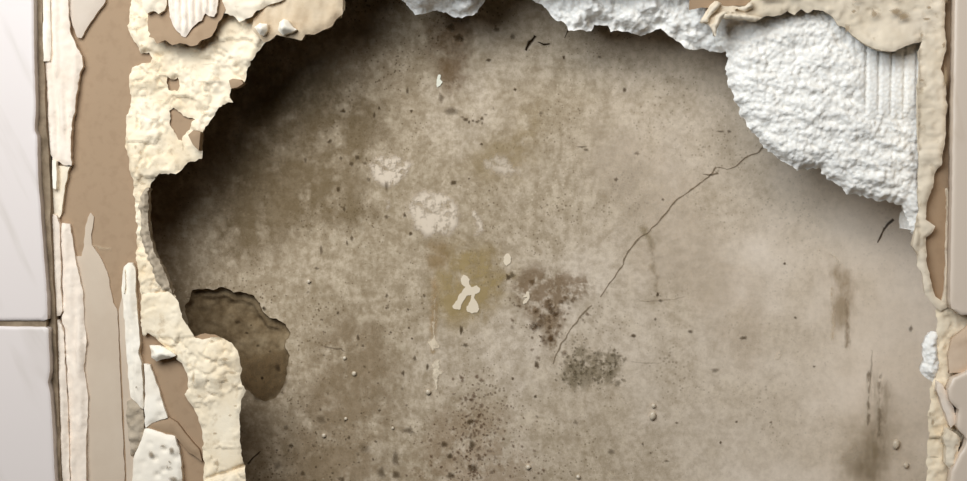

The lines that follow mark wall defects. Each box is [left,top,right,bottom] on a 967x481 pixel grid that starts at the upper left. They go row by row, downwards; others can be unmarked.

peeling [76,213,125,481]
spalling [125,0,345,481]
leakage [519,273,585,340]
crack [553,147,763,363]
flaking render [699,0,967,481]